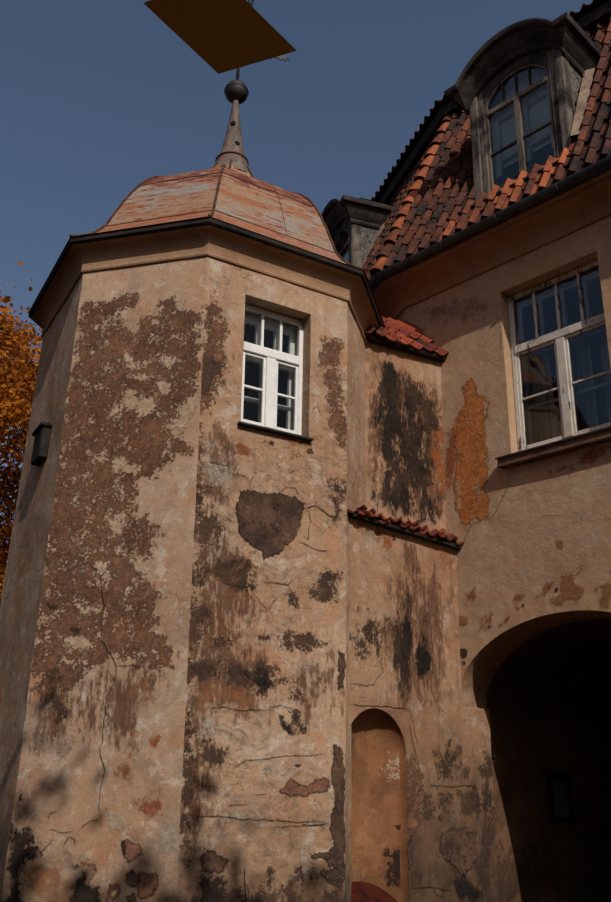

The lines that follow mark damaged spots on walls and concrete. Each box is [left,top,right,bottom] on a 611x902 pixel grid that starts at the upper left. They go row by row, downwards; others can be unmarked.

flaking render [30,290,235,697]
flaking render [235,489,305,559]
flaking render [318,336,347,448]
damp [368,354,446,524]
flaking render [429,377,490,525]
damp [349,541,451,710]
crack [34,546,142,857]
damp [3,809,43,902]
damp [68,859,101,902]
flaking render [106,839,160,902]
flaking render [280,744,345,902]